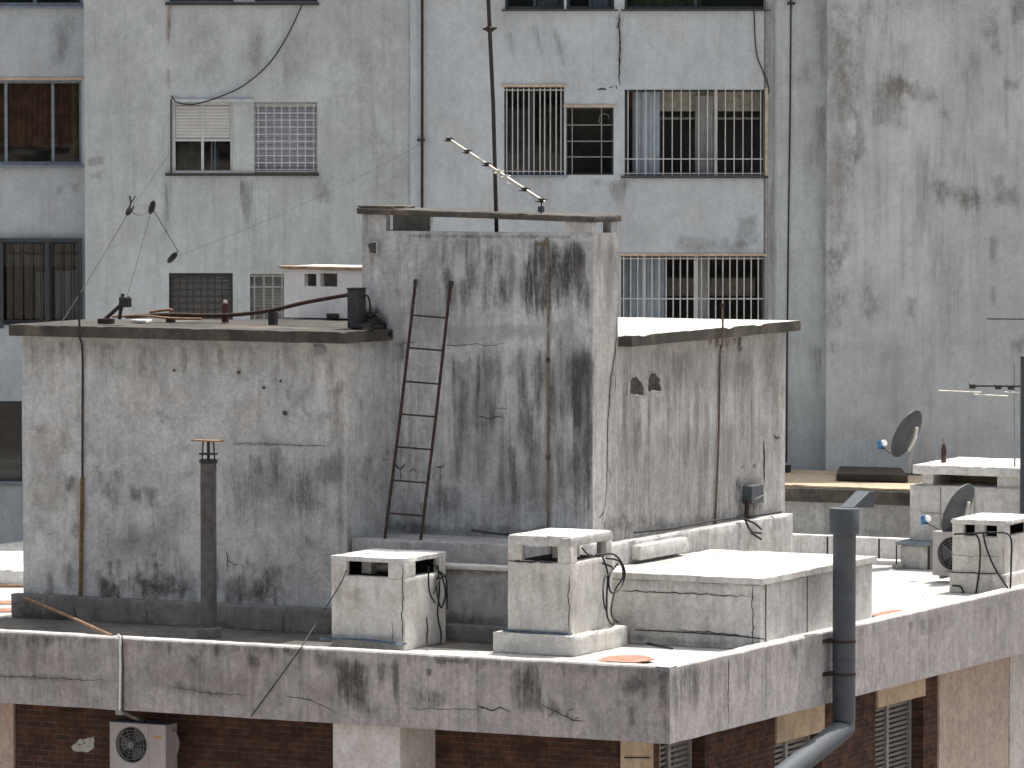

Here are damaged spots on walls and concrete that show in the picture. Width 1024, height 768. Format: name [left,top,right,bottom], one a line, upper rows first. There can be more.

crack [598,12,621,90]
spalling [628,371,662,400]
crack [3,675,106,683]
crack [412,691,509,712]